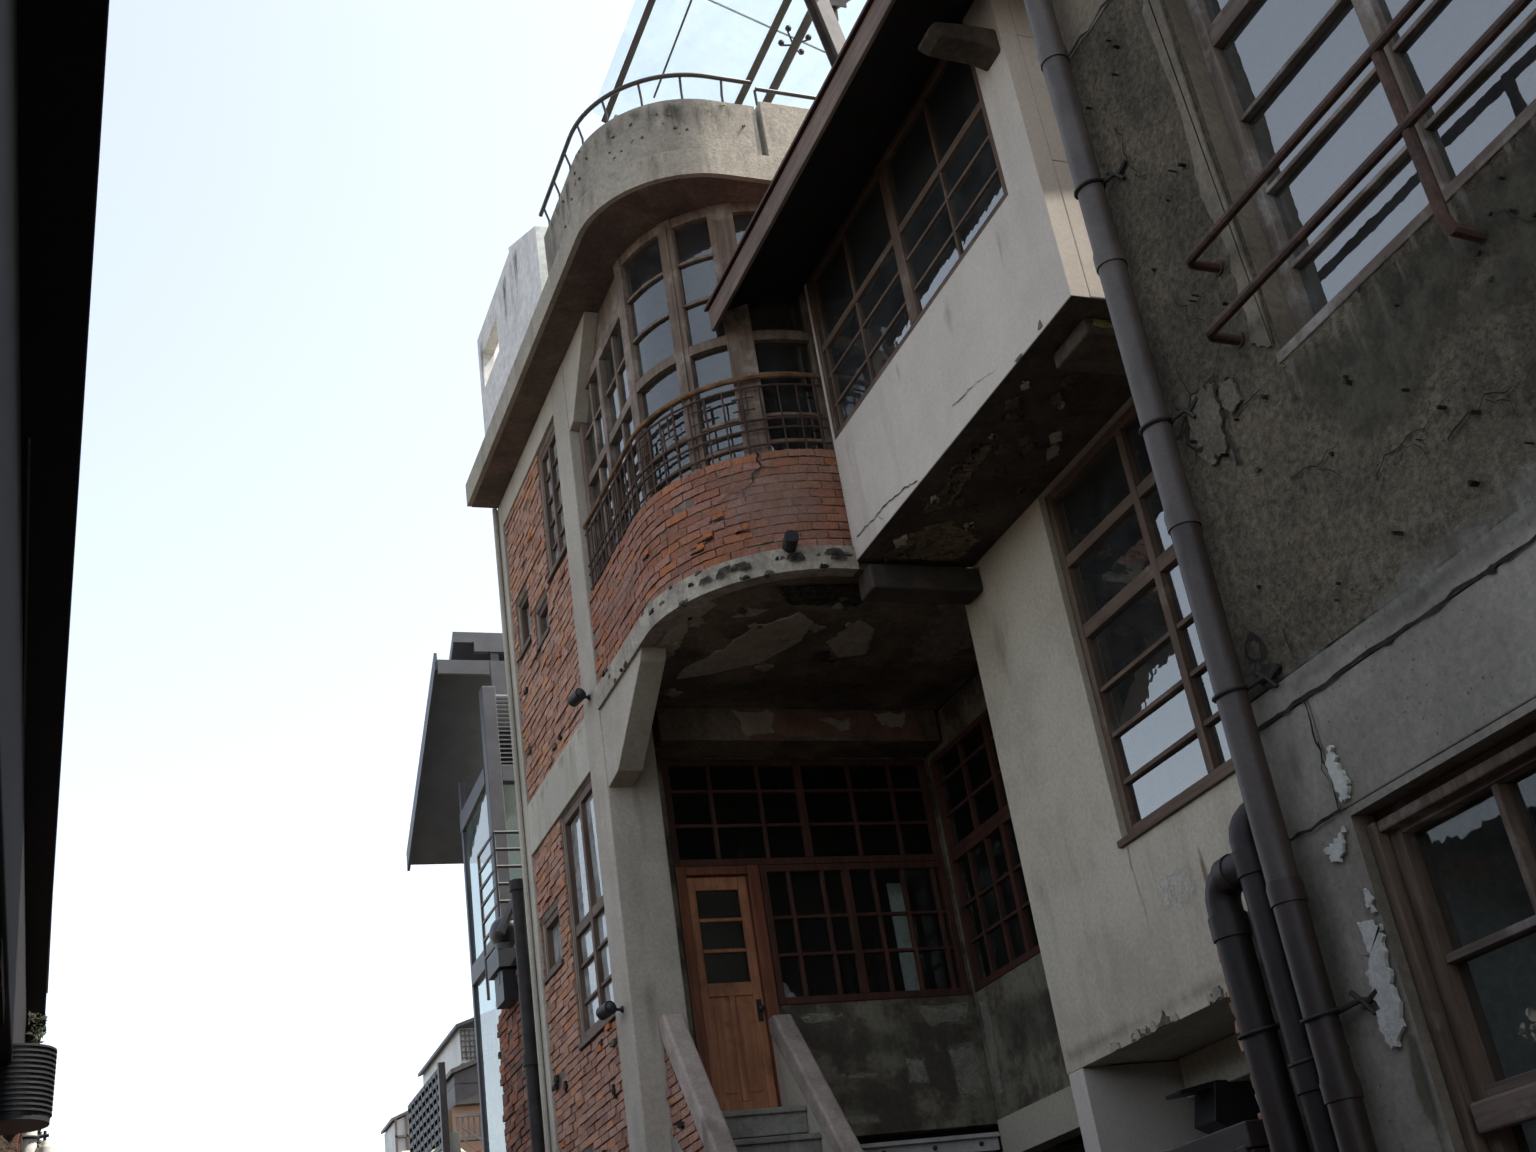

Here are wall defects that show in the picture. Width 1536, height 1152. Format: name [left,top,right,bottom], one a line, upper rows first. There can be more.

flaking render [1187,377,1268,466]
peeling [641,510,875,697]
peeling [905,604,973,665]
crack [1258,534,1536,840]
peeling [1325,745,1351,802]
peeling [1323,826,1347,863]
peeling [1357,888,1406,1050]
water stain [906,1058,928,1082]
water stain [919,999,1003,1098]